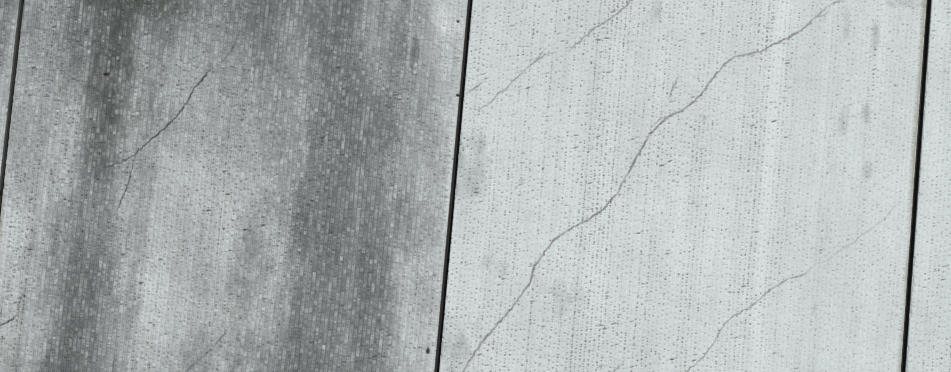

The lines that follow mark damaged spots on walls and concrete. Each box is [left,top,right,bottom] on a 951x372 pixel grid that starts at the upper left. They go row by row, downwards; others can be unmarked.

efflorescence [417,0,465,74]
damp [43,146,115,372]
damp [297,126,382,372]
crack [474,198,613,354]